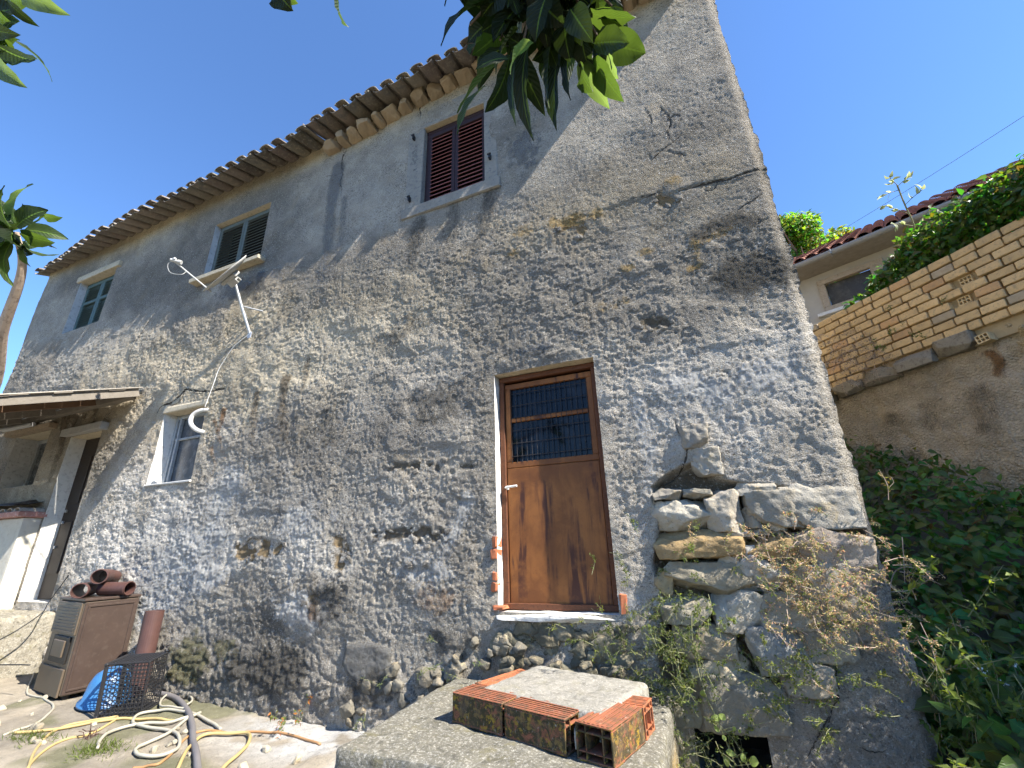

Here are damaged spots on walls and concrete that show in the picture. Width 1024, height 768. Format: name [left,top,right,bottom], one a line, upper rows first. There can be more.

crack [646,108,682,159]
crack [630,168,761,212]
spalling [235,537,286,570]
spalling [651,422,881,768]
damp [227,645,305,697]
damp [341,672,395,714]